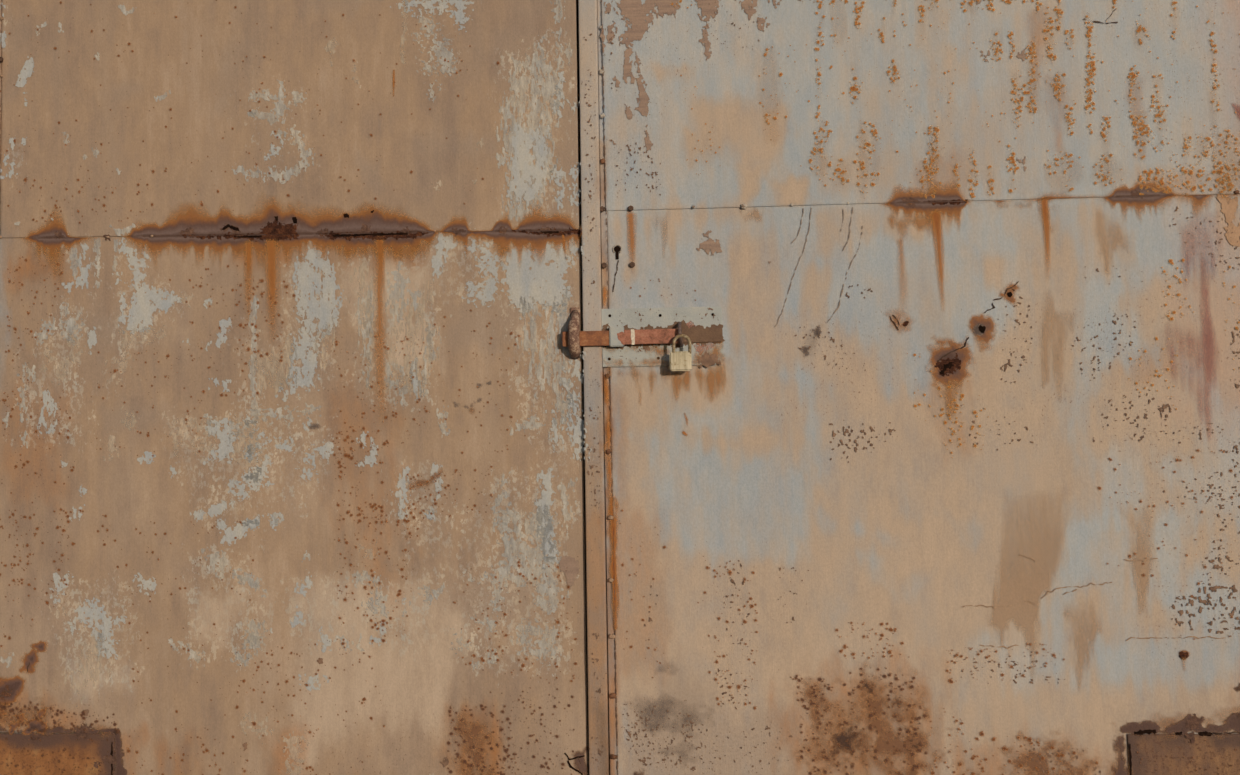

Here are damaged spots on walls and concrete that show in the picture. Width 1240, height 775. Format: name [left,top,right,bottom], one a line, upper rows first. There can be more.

peeling [390,0,474,103]
peeling [231,79,316,184]
corrosion [806,0,1240,293]
peeling [2,362,59,448]
corrosion [5,170,113,361]
peeling [34,223,182,355]
peeling [190,241,446,598]
corrosion [121,181,582,669]
peeling [431,0,681,670]
corrosion [0,502,84,620]
corrosion [229,634,345,709]
corrosion [790,622,1098,775]